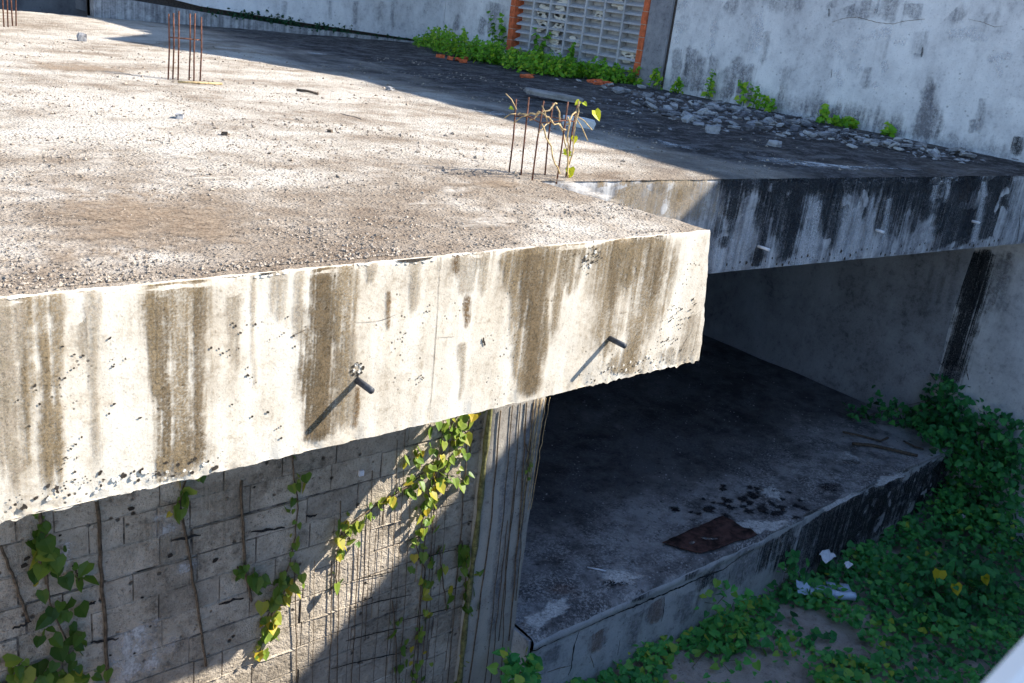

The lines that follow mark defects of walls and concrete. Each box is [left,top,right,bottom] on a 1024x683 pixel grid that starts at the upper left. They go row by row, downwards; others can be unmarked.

water stain [1011,136,1023,156]
water stain [0,293,65,482]
water stain [79,290,102,453]
water stain [144,279,211,482]
water stain [227,275,257,364]
water stain [271,263,378,440]
water stain [410,261,420,310]
water stain [451,235,678,397]
water stain [608,161,1022,384]